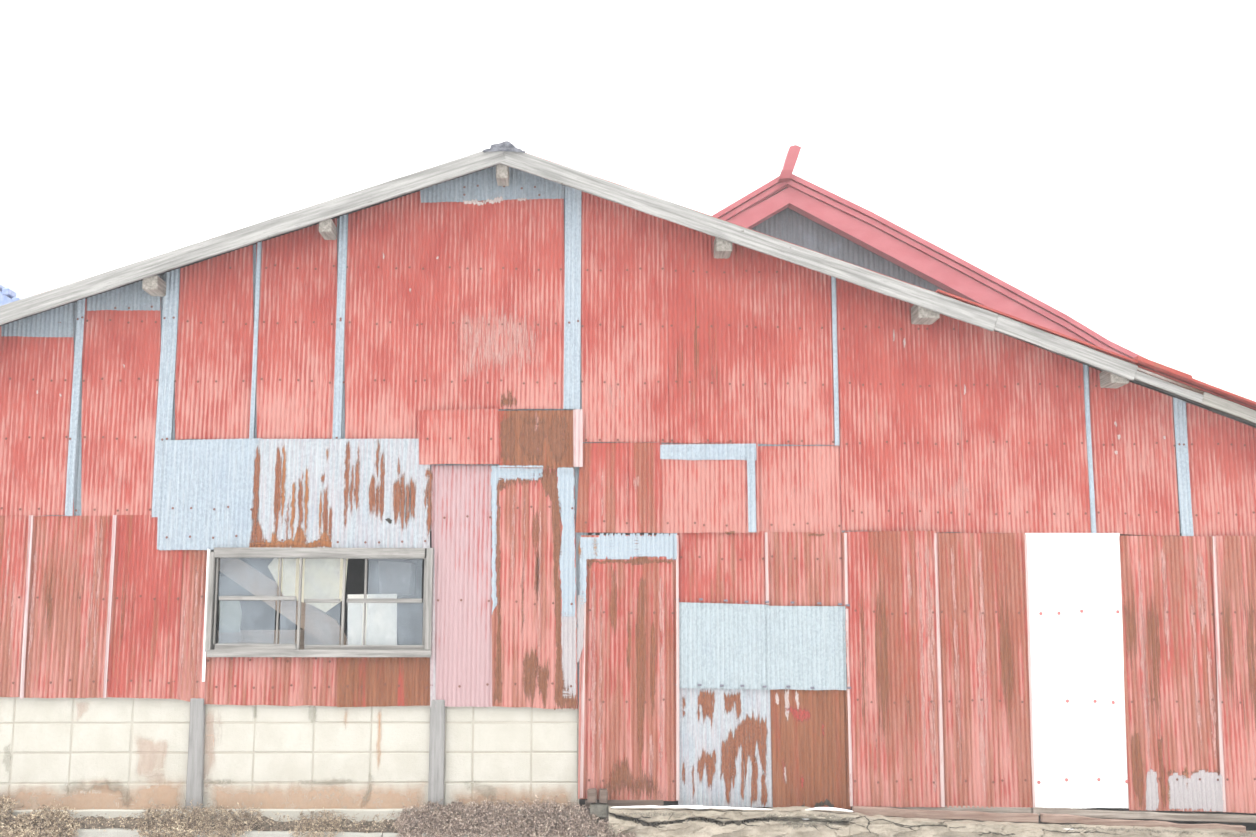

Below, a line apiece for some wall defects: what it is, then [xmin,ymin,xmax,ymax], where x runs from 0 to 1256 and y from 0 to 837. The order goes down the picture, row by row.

rust [249,442,433,548]
rust [494,389,576,710]
rust [578,537,674,797]
rust [682,690,768,808]
rust [858,586,890,745]
rust [998,590,1014,733]
rust [1124,591,1218,808]
rust [1221,600,1256,727]